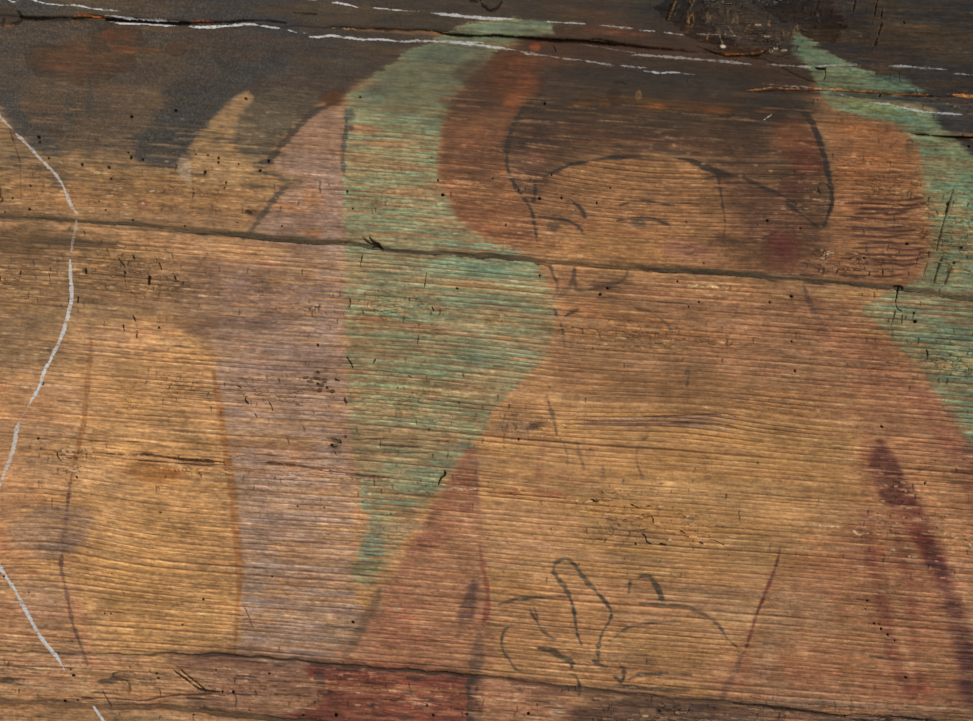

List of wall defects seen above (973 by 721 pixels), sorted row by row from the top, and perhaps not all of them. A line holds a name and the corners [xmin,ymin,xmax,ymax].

crack [20,12,765,57]
crack [362,236,384,250]
crack [732,702,923,721]